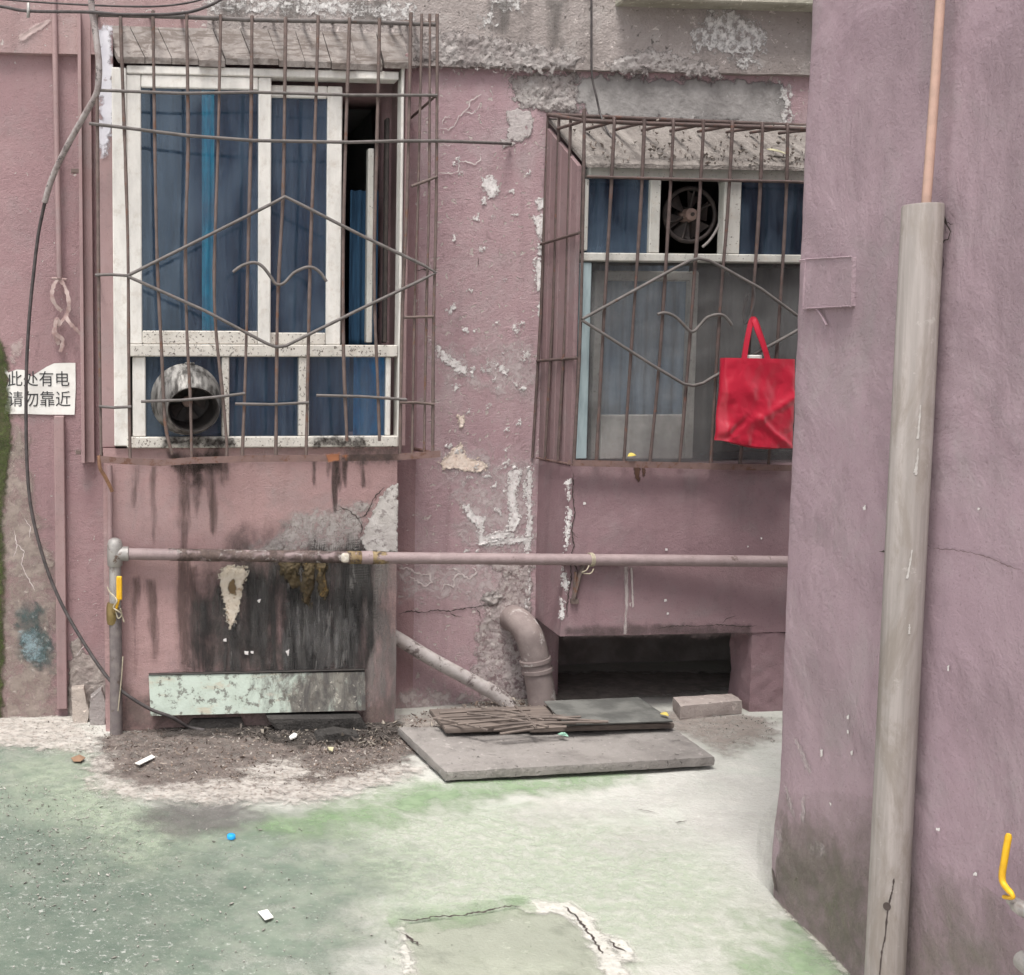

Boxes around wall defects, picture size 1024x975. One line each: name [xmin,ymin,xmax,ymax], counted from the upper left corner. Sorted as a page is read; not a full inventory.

flaking render [202,0,795,148]
peeling [532,197,544,317]
peeling [360,483,398,552]
peeling [562,478,586,553]
leakage [134,582,156,641]
peeling [217,564,249,630]
leakage [169,449,473,723]
crack [399,605,487,617]
leakage [122,698,271,729]
crack [401,905,516,945]
crack [564,906,625,954]
crack [879,879,895,975]